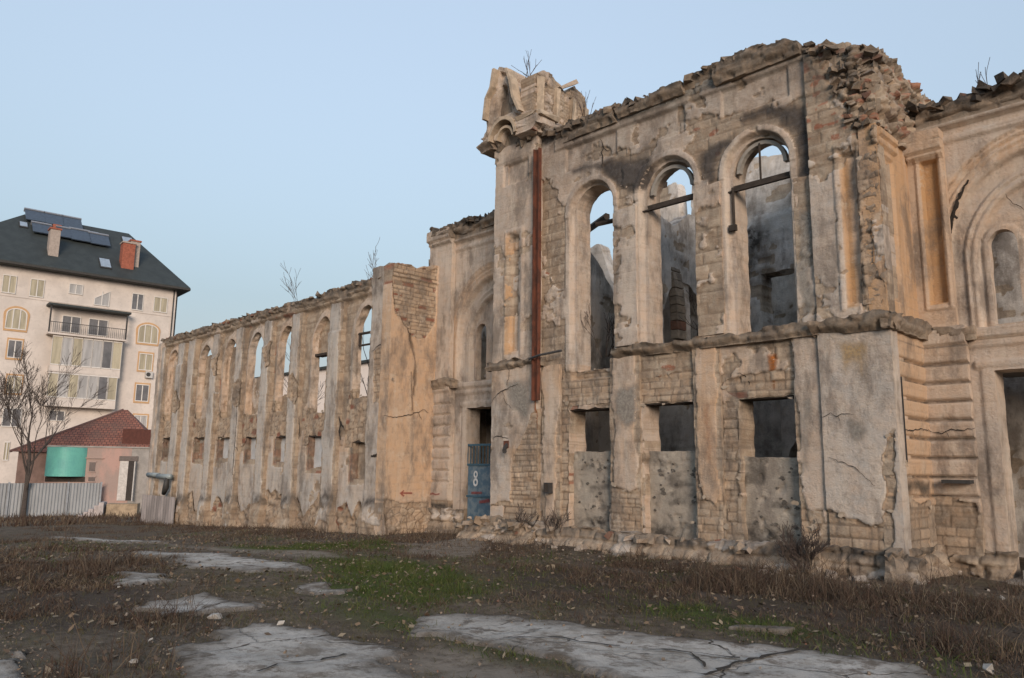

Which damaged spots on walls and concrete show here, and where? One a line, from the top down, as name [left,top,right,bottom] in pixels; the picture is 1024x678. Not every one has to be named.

spalling [683,56,735,85]
spalling [496,95,649,152]
damp [701,140,731,182]
damp [744,106,810,177]
spalling [801,39,888,305]
crack [950,180,969,234]
spalling [160,263,438,342]
crack [906,428,974,437]
spalling [455,369,978,586]
spalling [384,499,431,535]